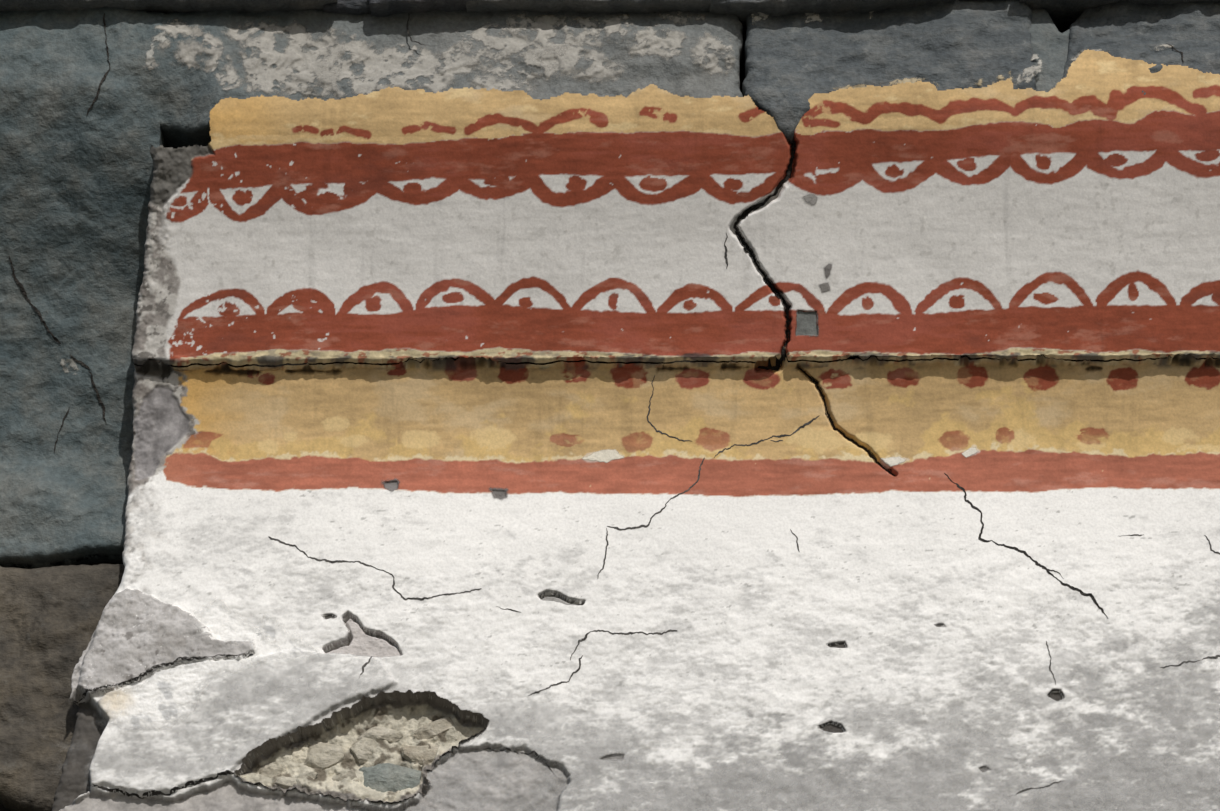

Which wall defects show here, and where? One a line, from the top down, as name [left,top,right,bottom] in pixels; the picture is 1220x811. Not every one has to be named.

peeling [145,11,735,98]
crack [9,256,107,424]
peeling [60,359,78,373]
crack [598,142,895,577]
crack [54,407,70,452]
crack [268,536,519,612]
crack [944,473,1108,618]
flaking render [69,589,402,729]
crack [1160,655,1220,668]
flaking render [234,690,489,804]